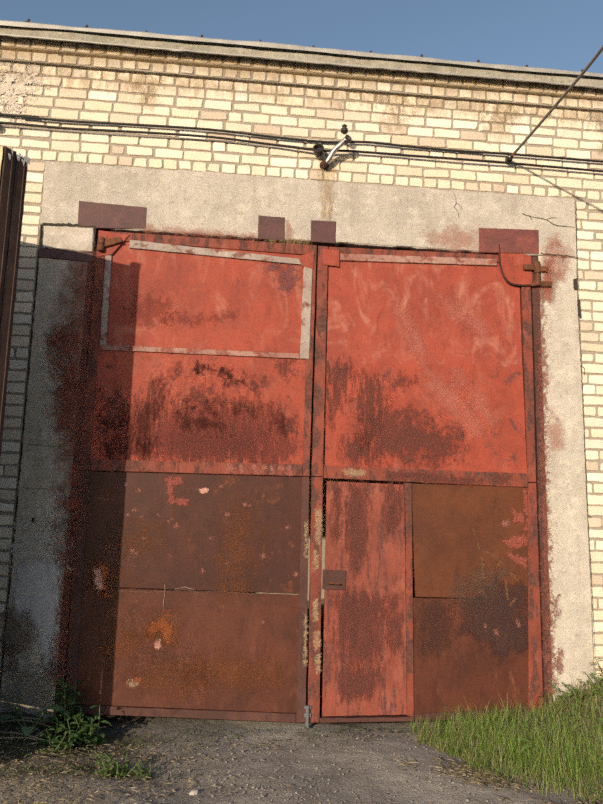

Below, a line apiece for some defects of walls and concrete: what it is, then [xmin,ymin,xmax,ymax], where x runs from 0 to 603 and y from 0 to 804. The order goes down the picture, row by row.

corrosion [95,362,299,464]
corrosion [324,358,510,486]
crack [522,206,596,662]
peeling [165,476,189,506]
leakage [10,557,63,672]
peeling [93,563,110,599]
corrosion [147,610,173,649]